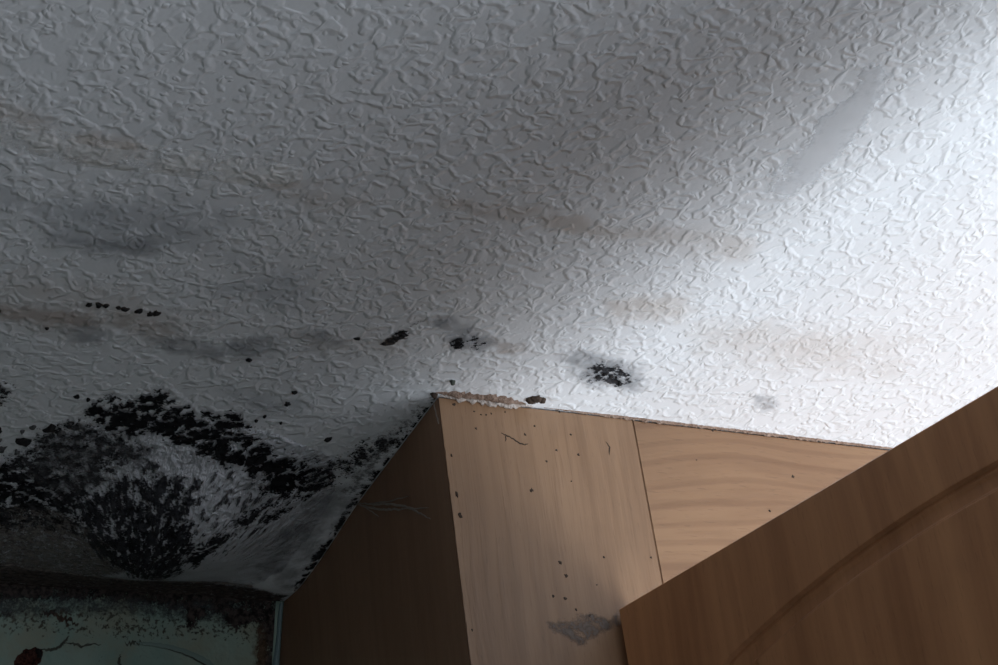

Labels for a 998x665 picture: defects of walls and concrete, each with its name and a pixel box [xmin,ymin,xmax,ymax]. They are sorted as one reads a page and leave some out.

damp [85,302,161,317]
damp [380,321,424,346]
damp [587,363,636,392]
damp [0,389,436,665]